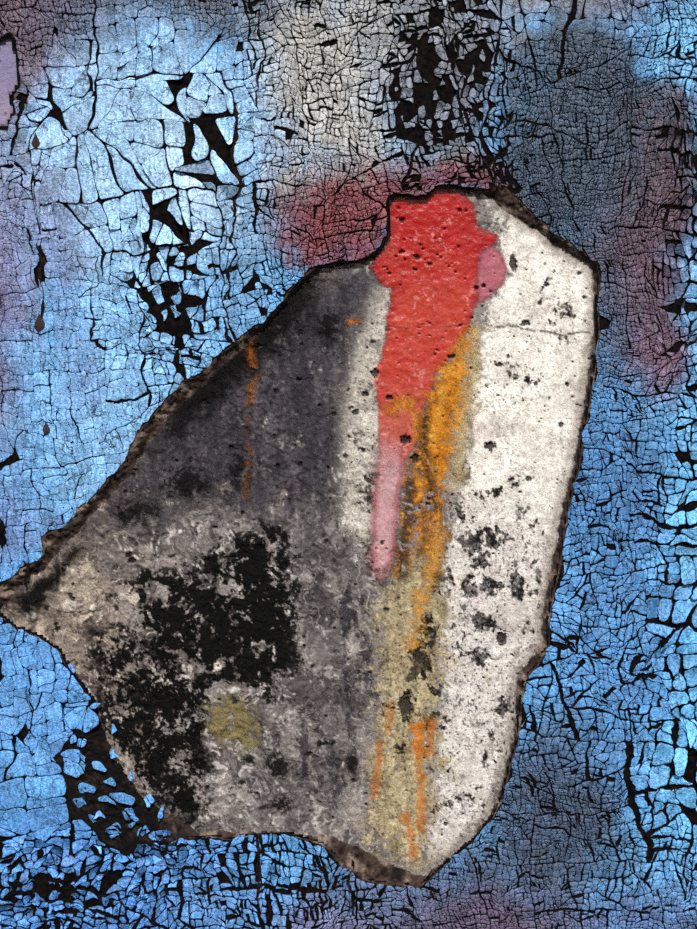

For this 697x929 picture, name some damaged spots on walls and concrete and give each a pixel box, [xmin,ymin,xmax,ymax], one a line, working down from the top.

peeling [0,32,23,133]
crack [87,44,156,85]
crack [101,140,135,169]
crack [220,0,268,341]
crack [32,180,46,317]
crack [82,224,106,334]
spalling [504,252,527,281]
spalling [250,638,277,662]
spalling [496,628,507,644]
spalling [390,654,455,810]
rust [400,720,435,856]
crack [253,834,262,909]